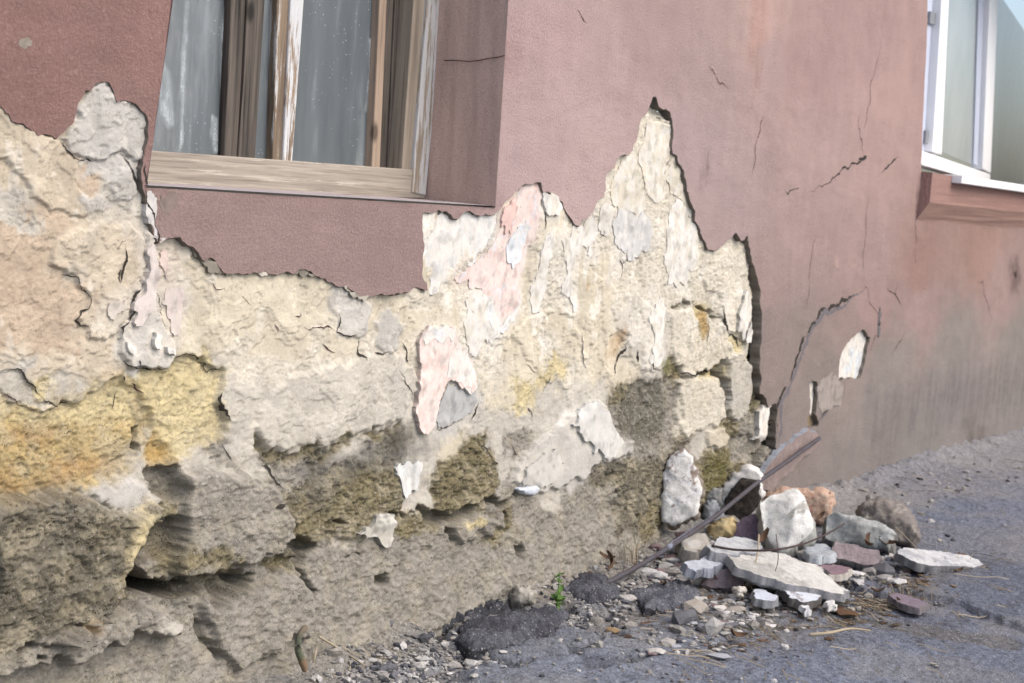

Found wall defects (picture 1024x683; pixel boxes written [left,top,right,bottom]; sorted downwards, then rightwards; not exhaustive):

crack [444,54,505,62]
crack [786,28,900,195]
flaking render [0,82,773,683]
crack [765,210,901,442]
spalling [839,330,866,379]